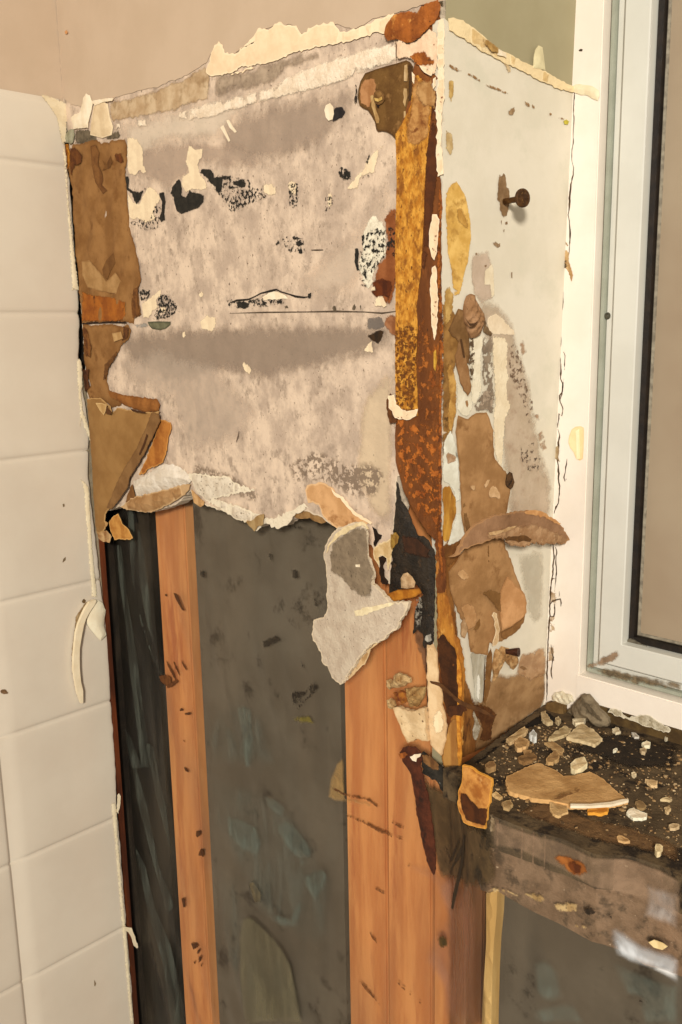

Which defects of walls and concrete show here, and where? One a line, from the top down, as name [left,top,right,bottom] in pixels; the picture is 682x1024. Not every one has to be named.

peeling [206,13,437,140]
spalling [128,187,160,223]
crack [567,93,575,252]
damp [126,327,380,376]
spalling [354,216,387,353]
damp [195,466,256,500]
damp [292,378,391,516]
rust [372,123,476,757]
peeling [443,431,464,545]
crack [554,353,567,513]
crack [546,545,562,700]
spalling [506,708,671,775]